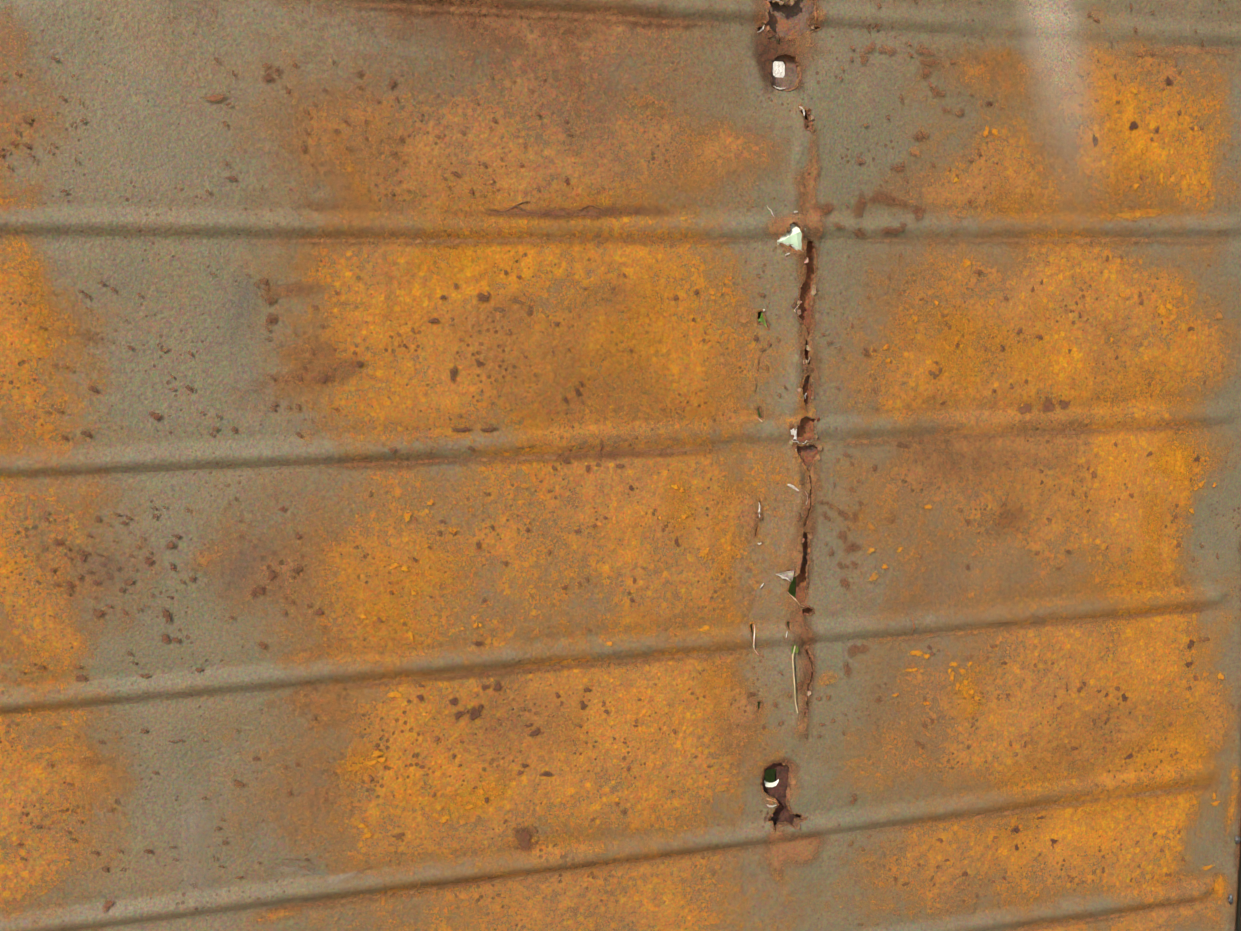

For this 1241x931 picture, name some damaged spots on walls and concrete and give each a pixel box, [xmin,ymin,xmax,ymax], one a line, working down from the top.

crack [798,103,814,132]
rust [0,241,77,456]
rust [0,475,116,691]
rust [197,0,833,931]
crack [776,238,822,617]
crack [803,648,815,716]
rust [846,45,1241,931]
rust [0,704,115,917]